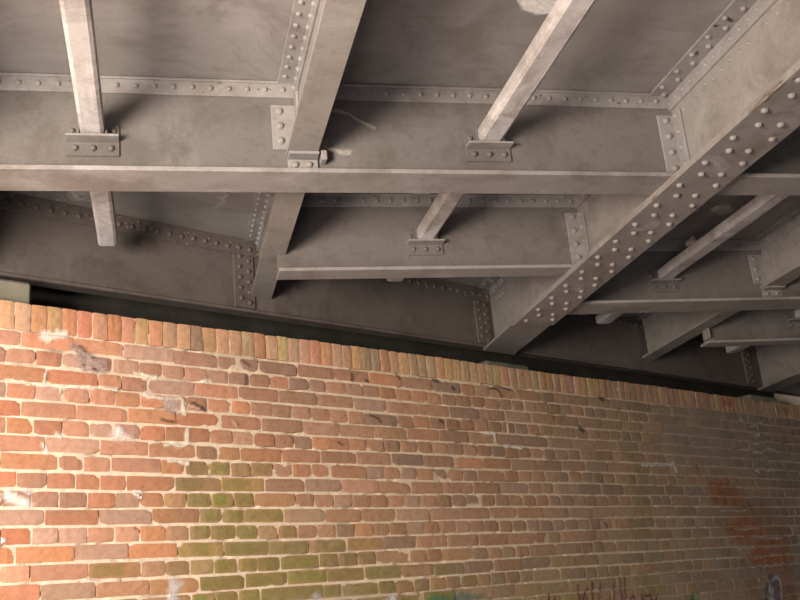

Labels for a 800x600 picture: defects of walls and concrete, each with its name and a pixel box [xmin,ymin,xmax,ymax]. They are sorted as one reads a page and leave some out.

leakage [41,331,67,342]
leakage [112,428,131,441]